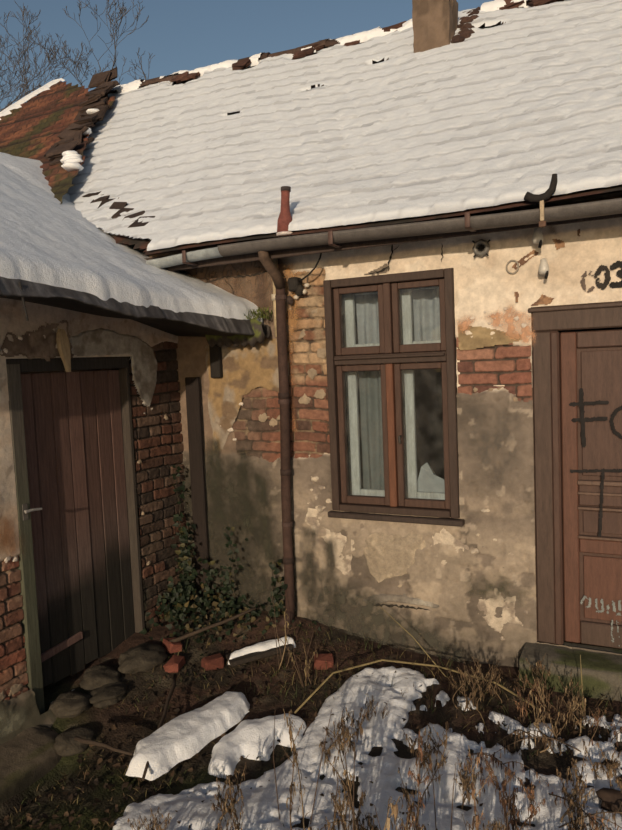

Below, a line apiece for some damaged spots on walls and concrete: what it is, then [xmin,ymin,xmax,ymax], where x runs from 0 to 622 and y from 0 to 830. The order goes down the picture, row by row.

spalling [0,320,74,361]
flaking render [205,267,330,462]
flaking render [456,292,535,402]
peeling [531,294,554,306]
flaking render [0,556,28,702]
water stain [299,531,462,663]
peeling [467,588,528,641]